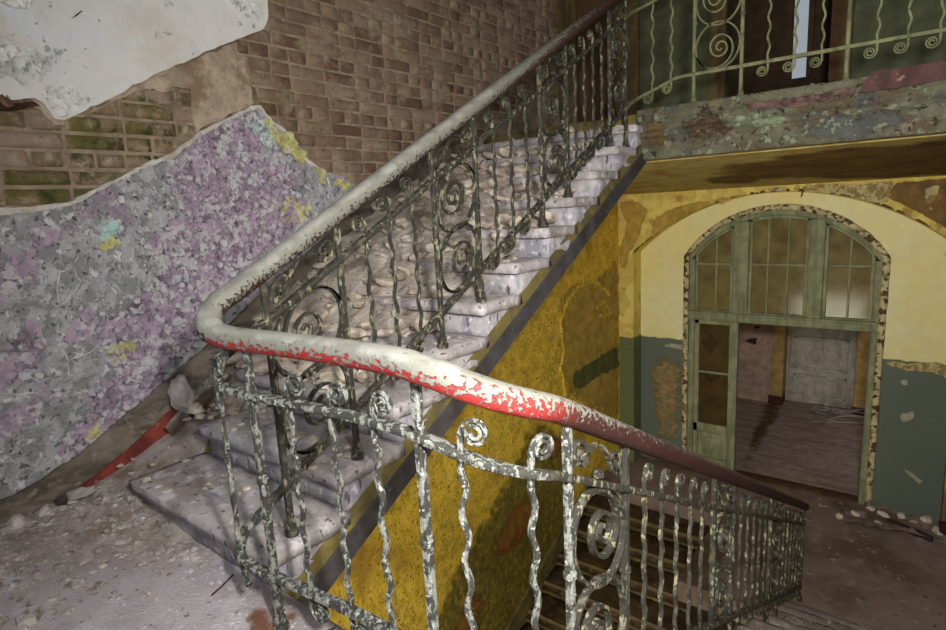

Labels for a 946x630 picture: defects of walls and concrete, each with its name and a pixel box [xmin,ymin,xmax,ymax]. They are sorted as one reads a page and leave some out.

peeling [732,61,946,127]
water stain [709,141,946,183]
flaking render [0,0,558,463]
flaking render [559,179,946,506]
corrosion [247,609,274,630]